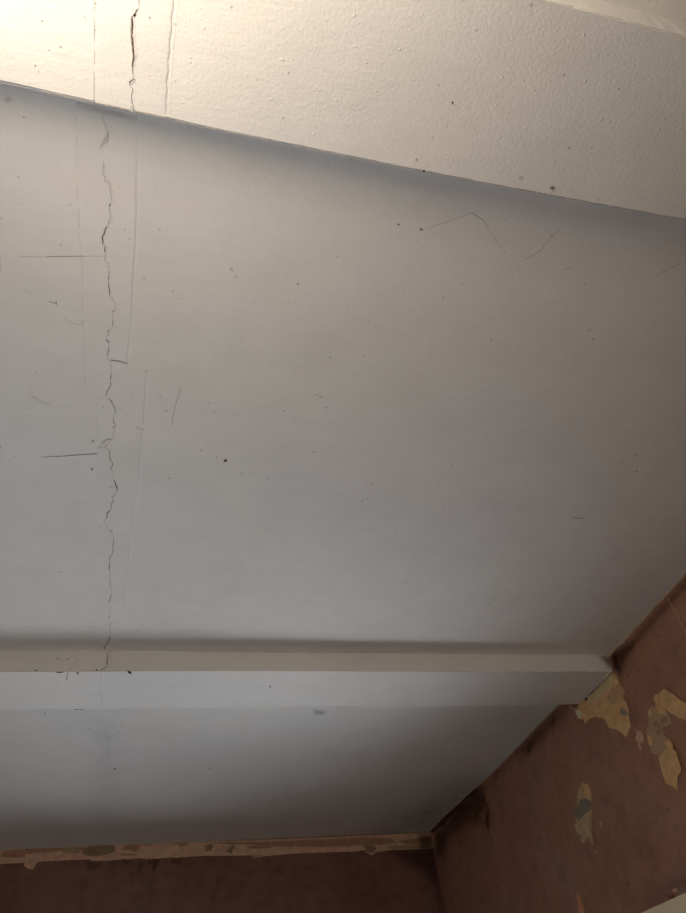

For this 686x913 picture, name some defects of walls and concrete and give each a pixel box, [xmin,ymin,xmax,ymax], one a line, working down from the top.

crack [129,0,139,112]
crack [0,116,145,671]
spalling [568,673,686,790]
peeling [0,832,434,869]
peeling [574,782,603,845]